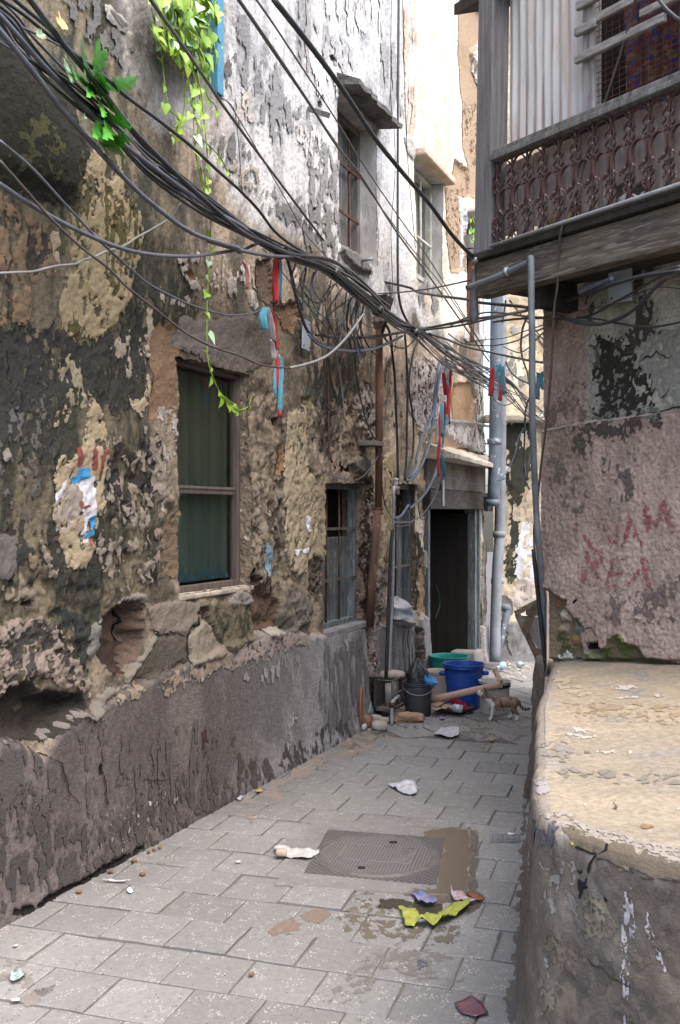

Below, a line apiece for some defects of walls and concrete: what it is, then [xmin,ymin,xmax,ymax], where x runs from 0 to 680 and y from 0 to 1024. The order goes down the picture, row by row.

hole [463,102,477,167]
spalling [446,182,466,262]
peeling [0,149,171,743]
peeling [105,355,444,706]
peeling [524,476,541,522]
spalling [508,579,671,664]